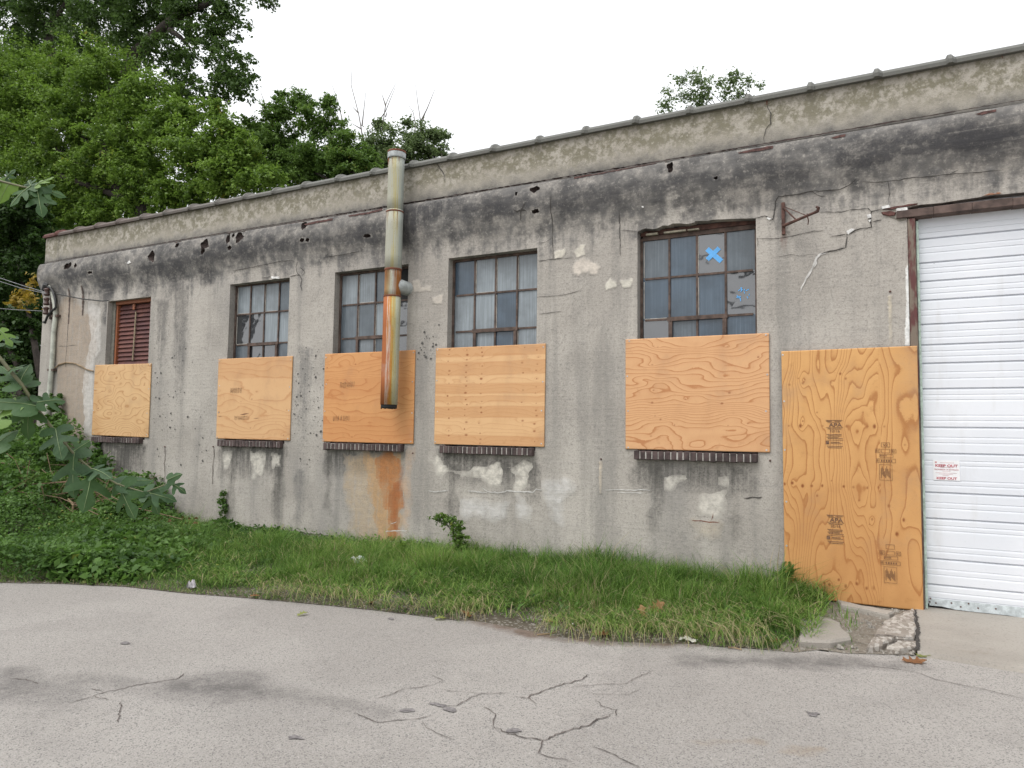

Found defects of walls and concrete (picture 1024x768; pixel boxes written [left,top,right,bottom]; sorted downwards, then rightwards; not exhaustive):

spalling [226,232,244,250]
flaking render [300,218,333,242]
crack [45,99,1024,291]
peeling [553,243,634,292]
damp [450,105,1024,241]
rust [341,444,419,542]
damp [424,445,579,534]
damp [623,452,767,552]
crack [354,671,651,768]